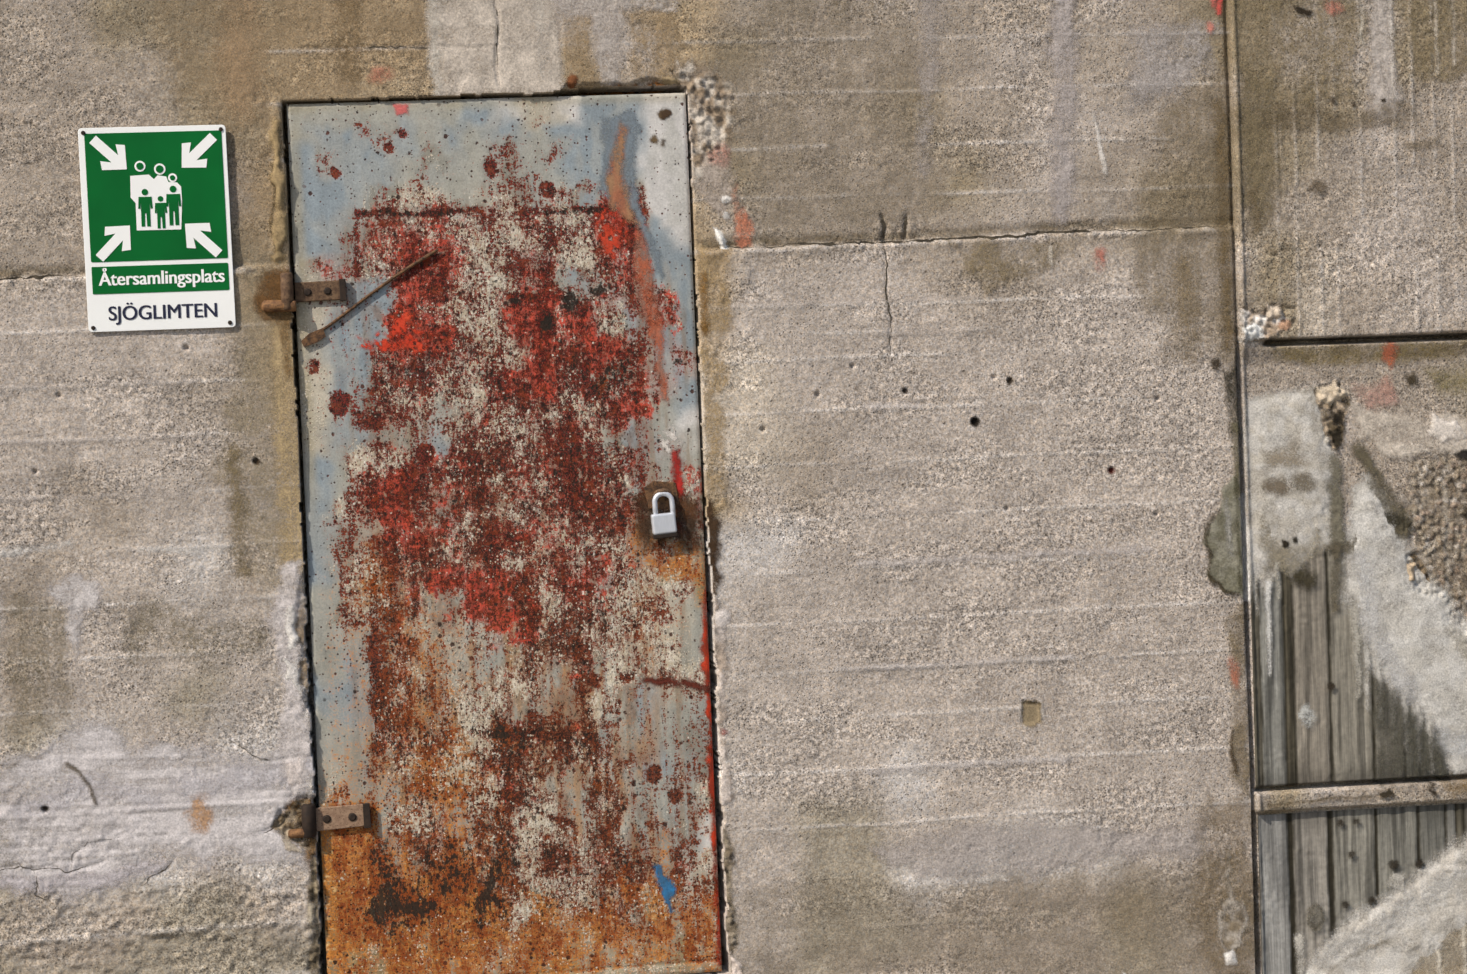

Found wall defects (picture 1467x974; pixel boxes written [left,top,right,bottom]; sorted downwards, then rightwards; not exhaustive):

rust [650,109,672,146]
leakage [1046,0,1078,223]
rust [606,125,668,401]
crack [710,216,1228,349]
leakage [1128,0,1467,771]
spalling [1314,381,1351,449]
peeling [1203,475,1244,597]
peeling [1390,413,1467,601]
leakage [0,574,313,902]
rust [643,677,710,693]
peeling [1451,632,1467,658]
peeling [1389,873,1404,892]